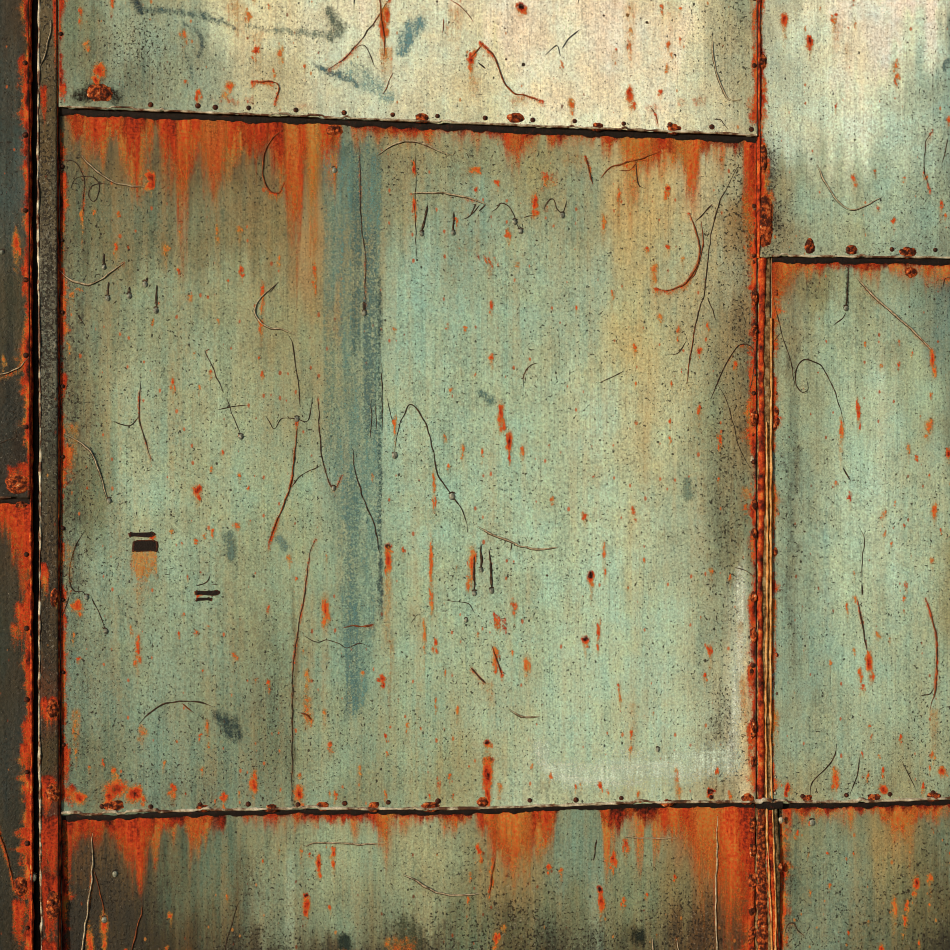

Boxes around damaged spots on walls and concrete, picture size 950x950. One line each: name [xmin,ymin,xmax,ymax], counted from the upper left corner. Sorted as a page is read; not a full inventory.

leakage [323,138,383,713]
corrosion [293,740,557,886]